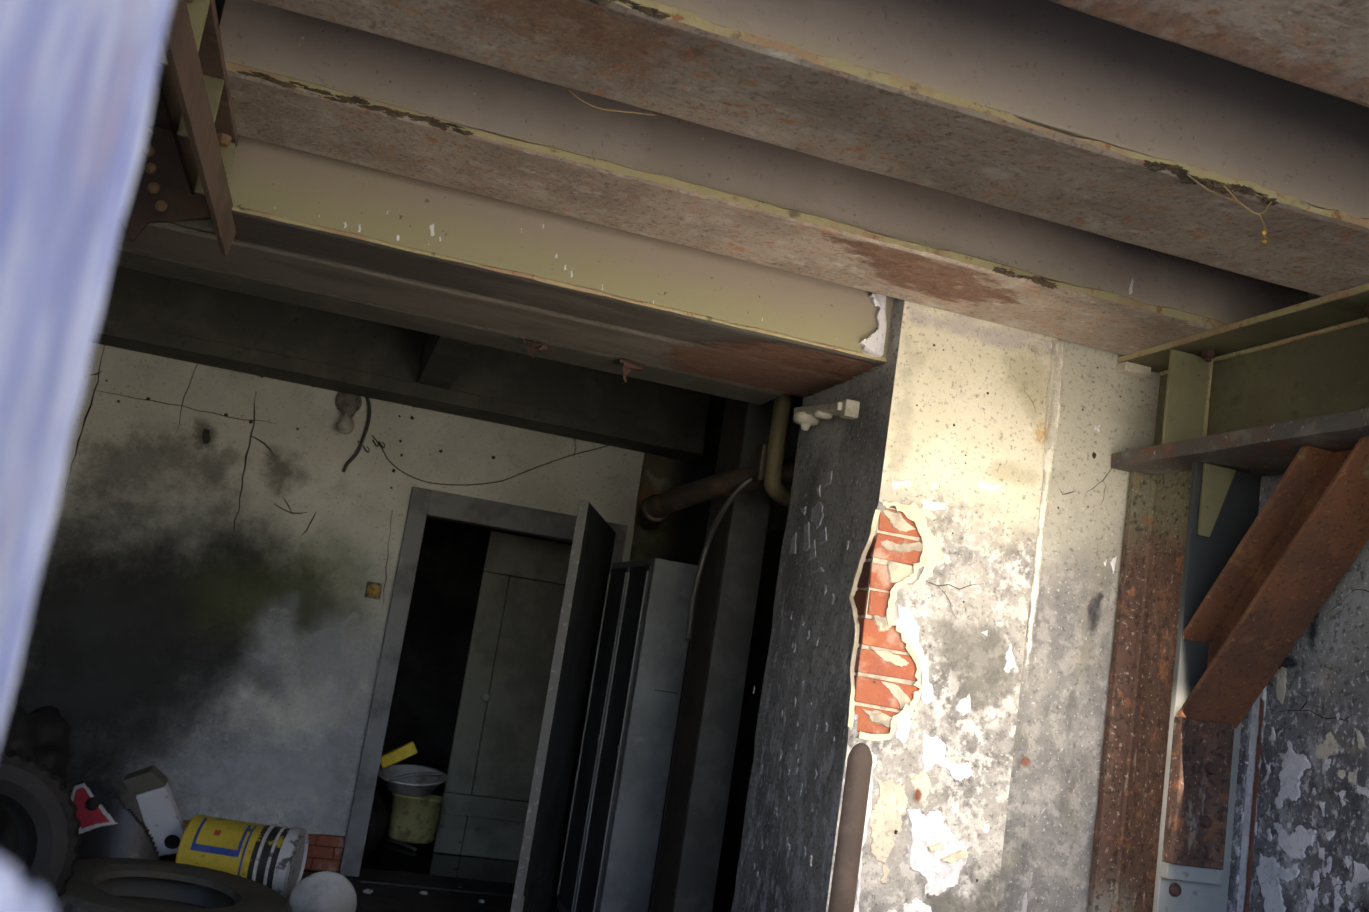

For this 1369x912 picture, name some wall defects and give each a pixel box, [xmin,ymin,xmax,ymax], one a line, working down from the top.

corrosion [827,234,1021,305]
crack [65,345,276,531]
crack [274,497,316,536]
peeling [760,681,818,817]
flaking render [785,471,973,912]
peeling [1003,643,1017,673]
flaking render [1276,667,1287,704]
peeling [1256,712,1369,912]